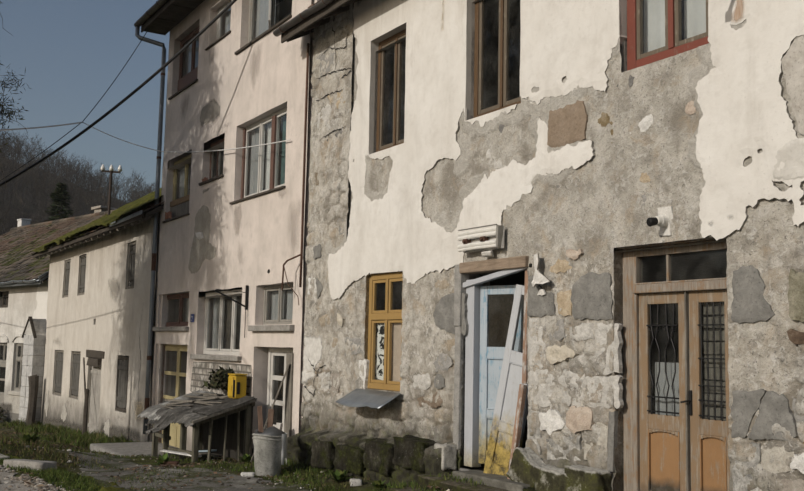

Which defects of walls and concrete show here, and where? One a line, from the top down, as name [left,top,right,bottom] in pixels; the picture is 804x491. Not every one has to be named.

flaking render [305,3,355,266]
crack [316,18,351,101]
flaking render [422,15,716,239]
flaking render [781,36,804,138]
flaking render [364,153,393,201]
flaking render [760,181,792,203]
flaking render [188,205,216,273]
flaking render [308,276,323,300]